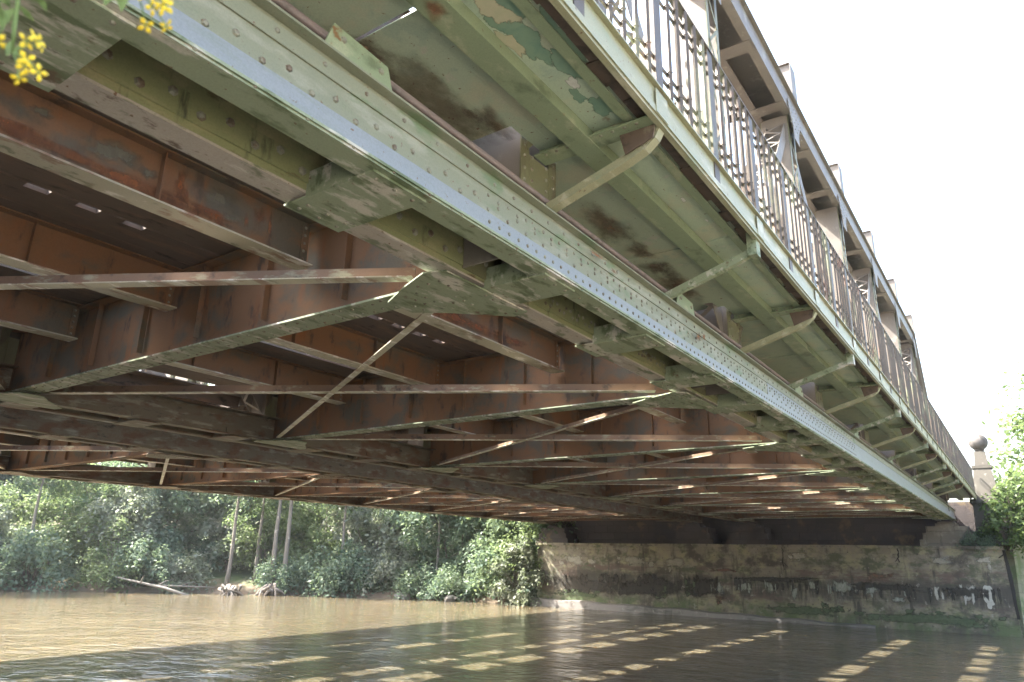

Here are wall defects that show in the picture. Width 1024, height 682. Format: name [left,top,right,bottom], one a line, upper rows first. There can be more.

corrosion [357,39,381,59]
peeling [475,0,614,116]
corrosion [388,69,508,137]
corrosion [0,117,225,225]
water stain [554,555,1002,609]